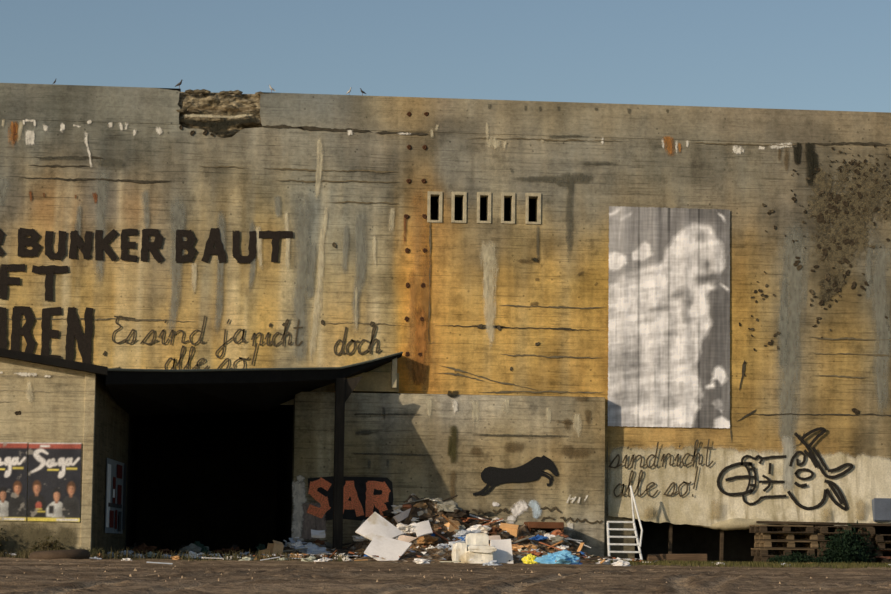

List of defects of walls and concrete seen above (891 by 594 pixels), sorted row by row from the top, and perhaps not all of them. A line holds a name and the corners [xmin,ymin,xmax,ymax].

rust [8,122,18,143]
spalling [176,89,265,138]
water stain [759,142,818,185]
water stain [510,162,613,249]
water stain [519,227,540,263]